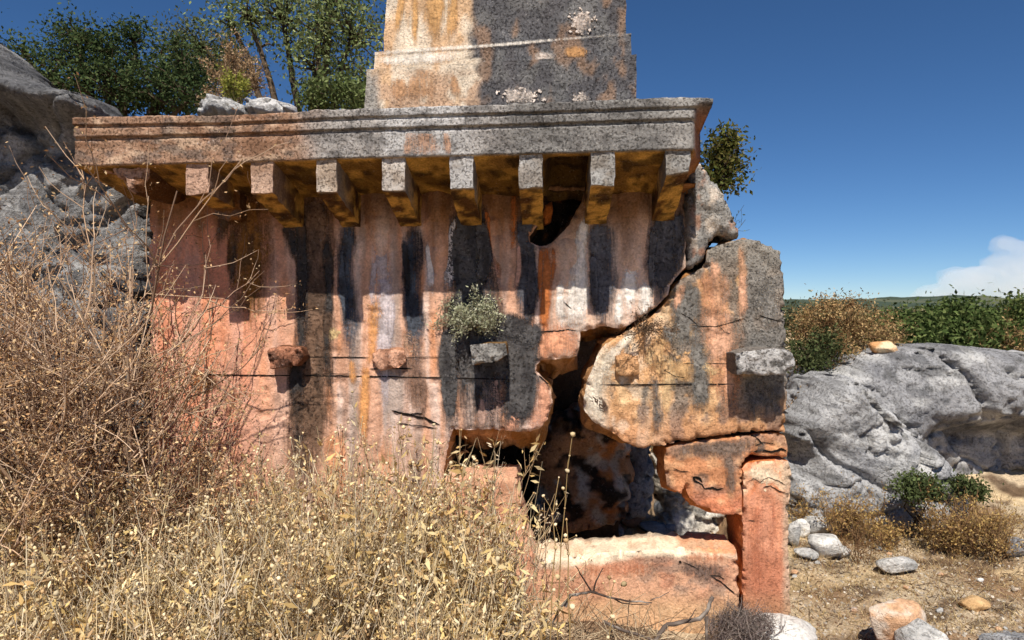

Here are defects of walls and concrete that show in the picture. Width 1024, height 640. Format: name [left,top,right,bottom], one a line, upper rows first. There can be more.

crack [616,237,782,334]
rust [349,303,378,437]
spalling [591,348,615,412]
crack [601,363,727,386]
crack [659,430,787,494]